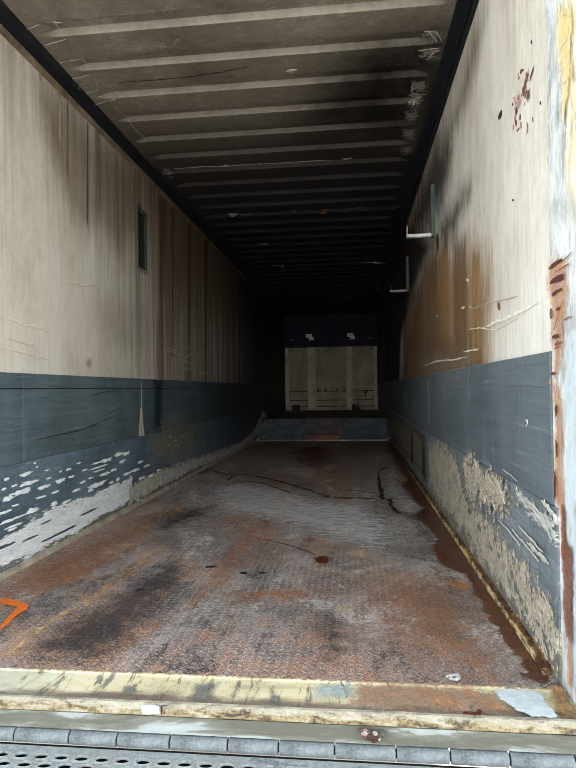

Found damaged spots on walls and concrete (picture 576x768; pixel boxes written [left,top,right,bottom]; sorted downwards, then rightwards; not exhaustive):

water stain [385,139,490,382]
rust [547,252,571,375]
rust [6,539,165,655]
peeling [0,411,267,569]
rust [187,514,329,609]
crack [207,467,417,514]
rust [349,385,576,718]
peeling [427,438,563,678]
peeling [494,689,557,718]